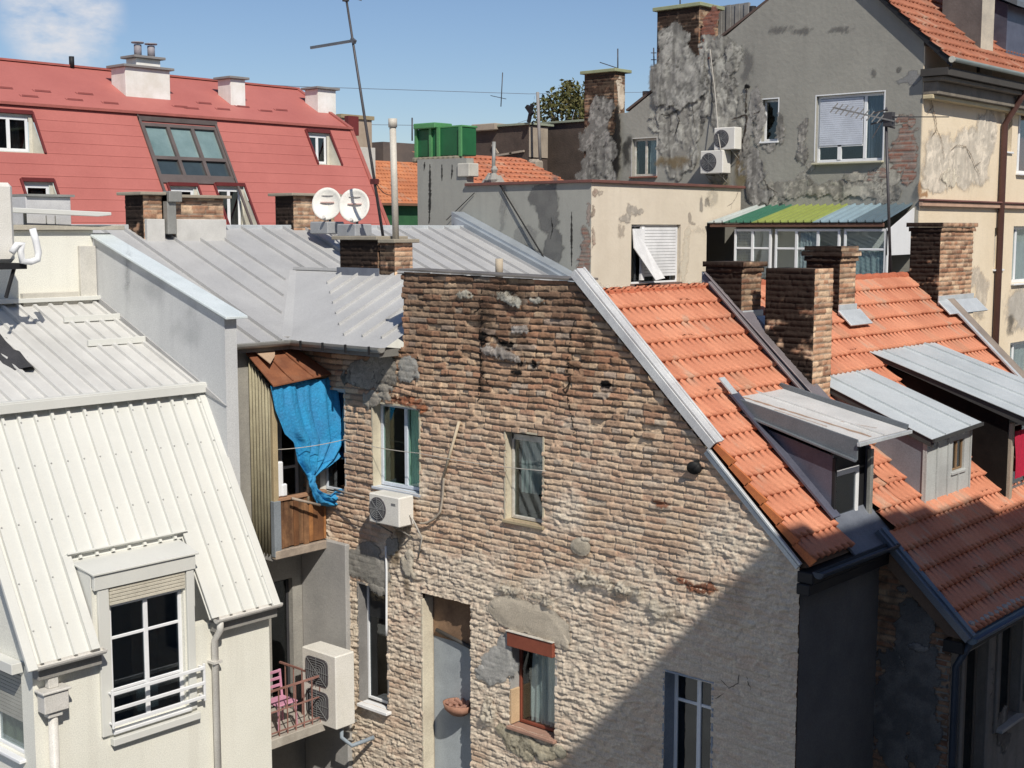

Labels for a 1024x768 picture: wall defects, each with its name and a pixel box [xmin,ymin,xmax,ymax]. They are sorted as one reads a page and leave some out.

flaking render [648,5,997,206]
leakage [500,177,564,262]
flaking render [619,204,643,236]
peeling [479,325,529,347]